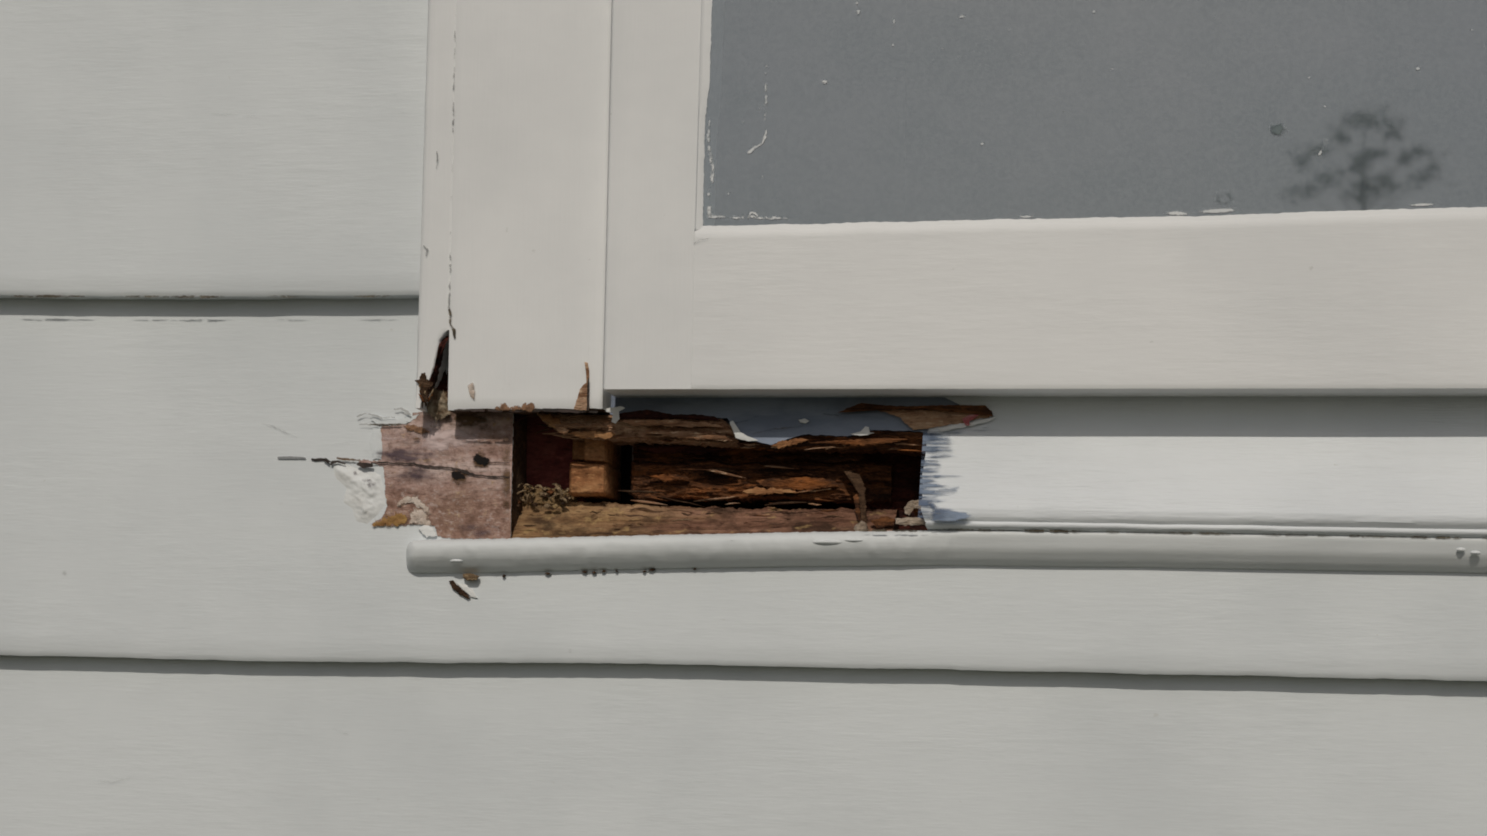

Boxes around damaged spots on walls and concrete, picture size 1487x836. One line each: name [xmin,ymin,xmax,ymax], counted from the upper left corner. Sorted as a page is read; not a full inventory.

crack [357,408,411,426]
peeling [605,406,625,424]
peeling [838,403,996,436]
peeling [359,336,535,539]
peeling [730,421,758,441]
crack [278,456,509,478]